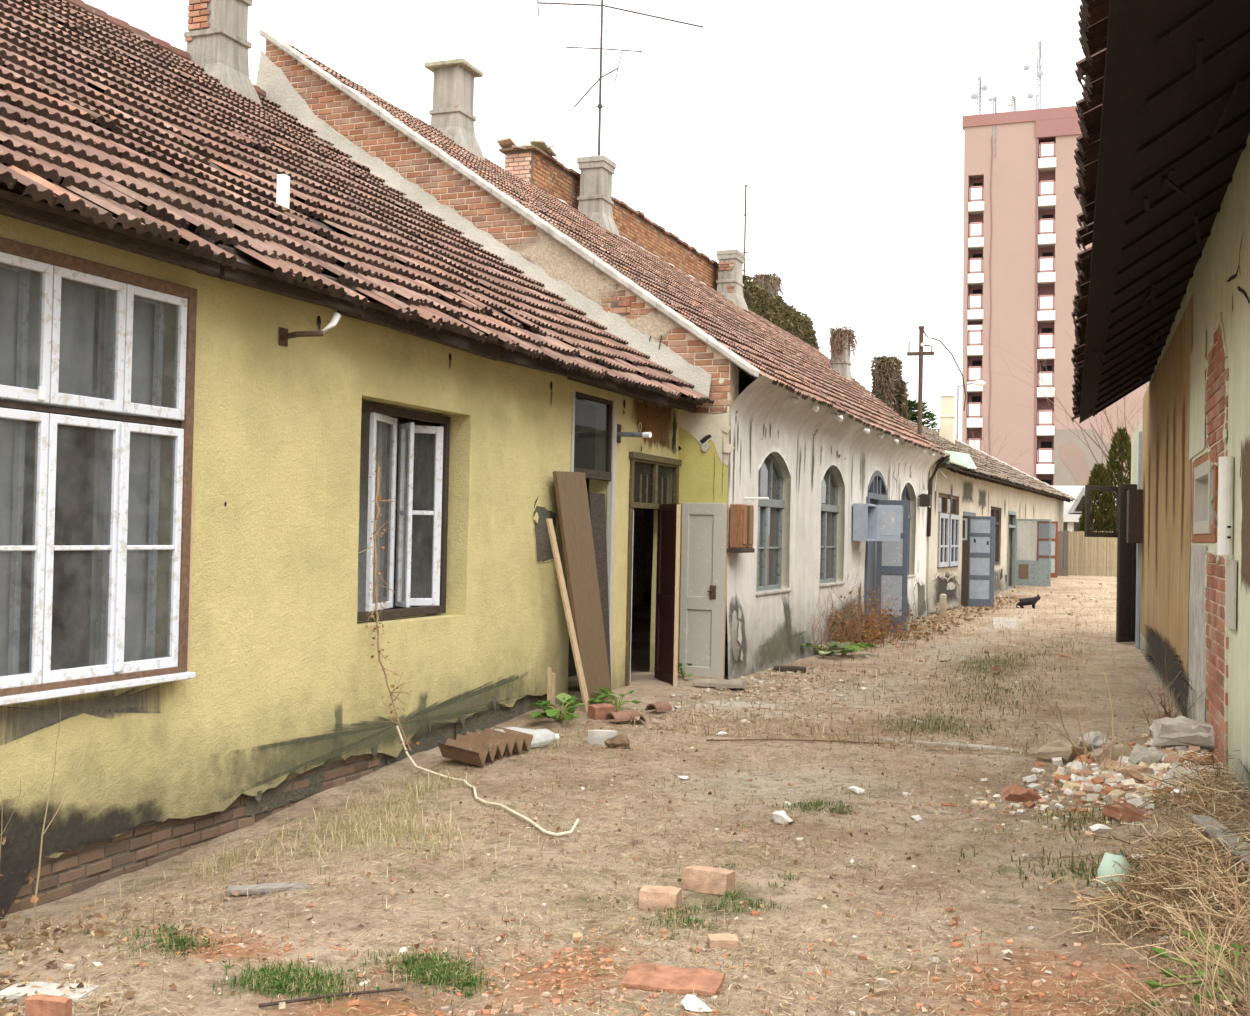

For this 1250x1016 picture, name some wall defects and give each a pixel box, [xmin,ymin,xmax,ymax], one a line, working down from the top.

spalling [1205,312,1229,469]
damp [722,421,779,498]
damp [796,436,865,495]
damp [760,602,805,665]
damp [828,584,862,638]
spalling [6,694,547,915]
damp [0,803,161,920]